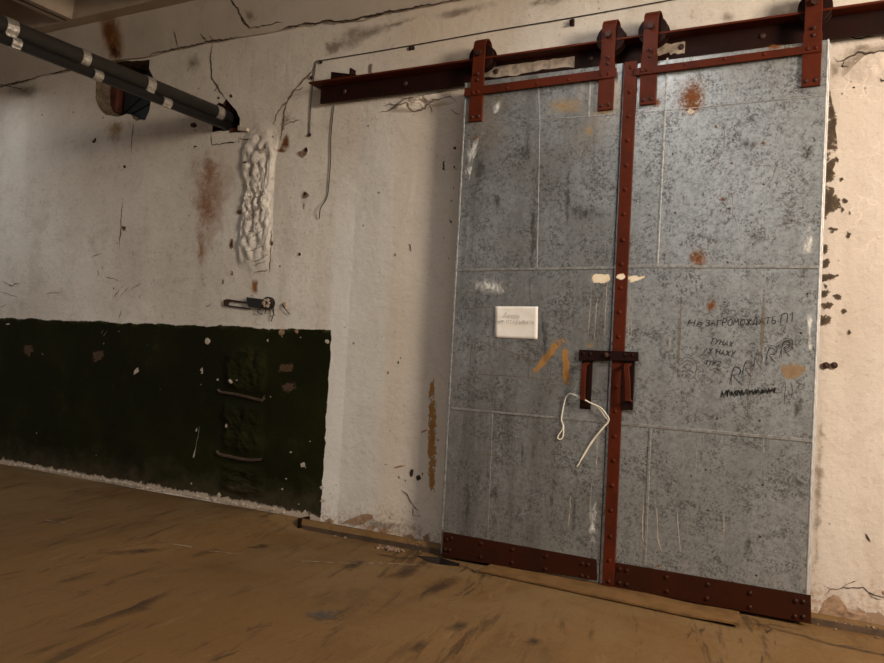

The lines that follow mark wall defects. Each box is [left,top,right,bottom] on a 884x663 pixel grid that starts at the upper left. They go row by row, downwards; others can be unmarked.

rust [103,19,121,58]
spalling [116,60,153,78]
crack [151,0,453,99]
crack [835,36,884,67]
spalling [95,81,151,121]
crack [379,90,459,115]
rust [678,82,704,111]
peeling [824,91,851,238]
peeling [820,244,847,326]
crack [827,581,881,599]